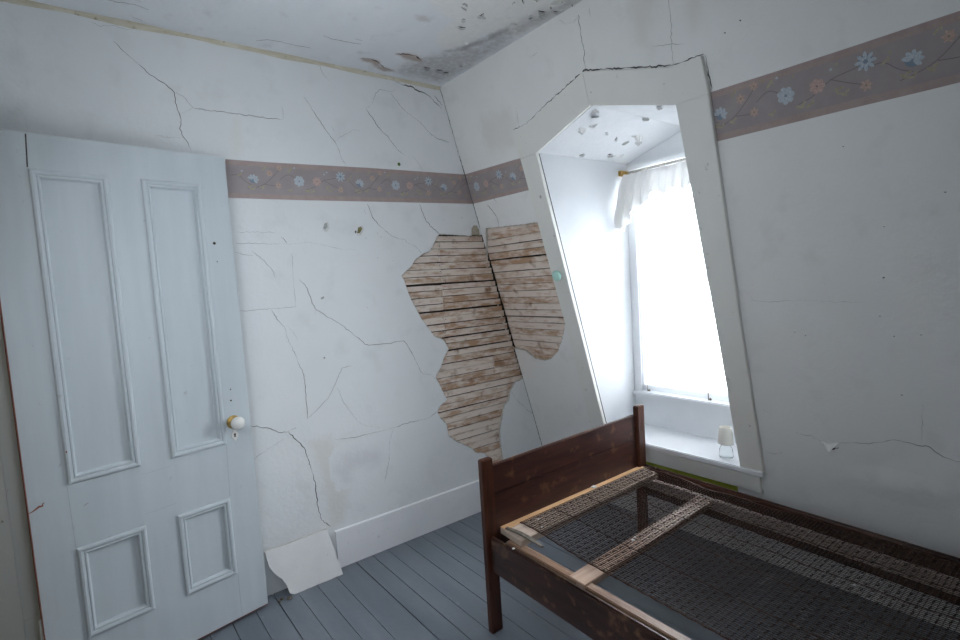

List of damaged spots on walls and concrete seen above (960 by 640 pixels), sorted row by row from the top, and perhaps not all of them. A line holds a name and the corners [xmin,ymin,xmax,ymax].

crack [116,43,283,145]
crack [368,82,498,227]
water stain [389,0,582,86]
peeling [418,0,574,51]
peeling [542,108,678,164]
crack [236,231,435,525]